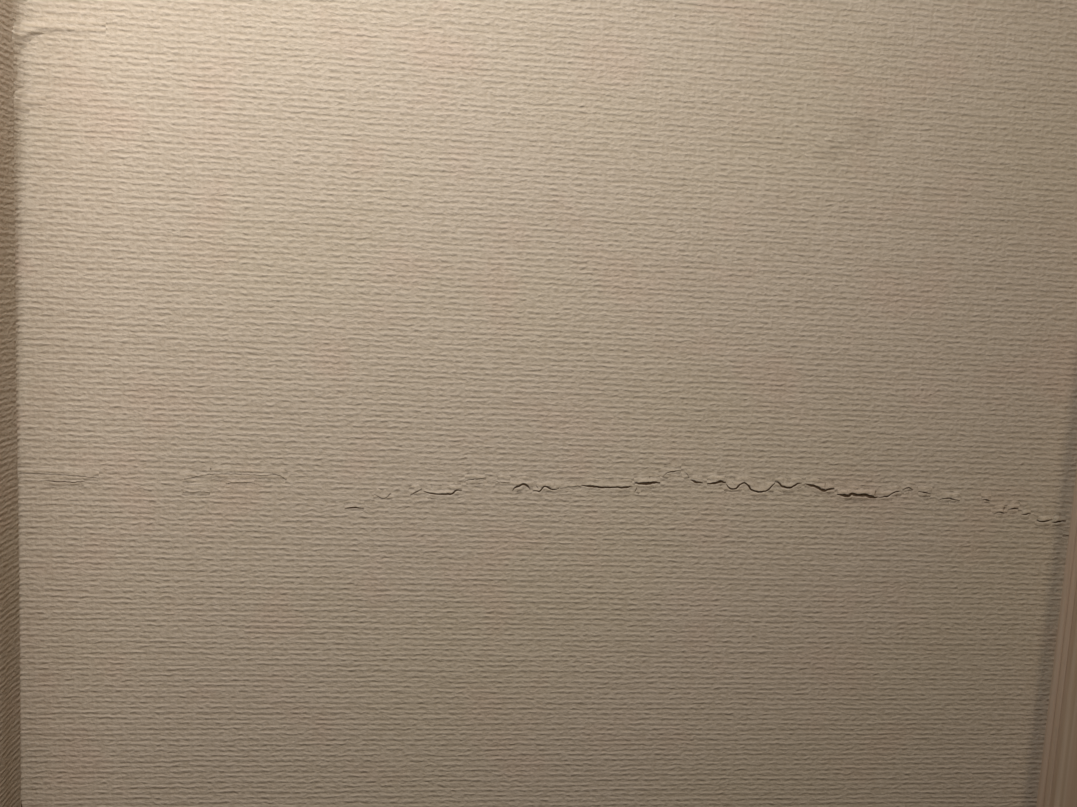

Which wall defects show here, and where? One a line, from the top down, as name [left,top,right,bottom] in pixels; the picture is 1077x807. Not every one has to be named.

crack [18,465,99,488]
crack [179,467,290,497]
crack [343,464,1070,540]